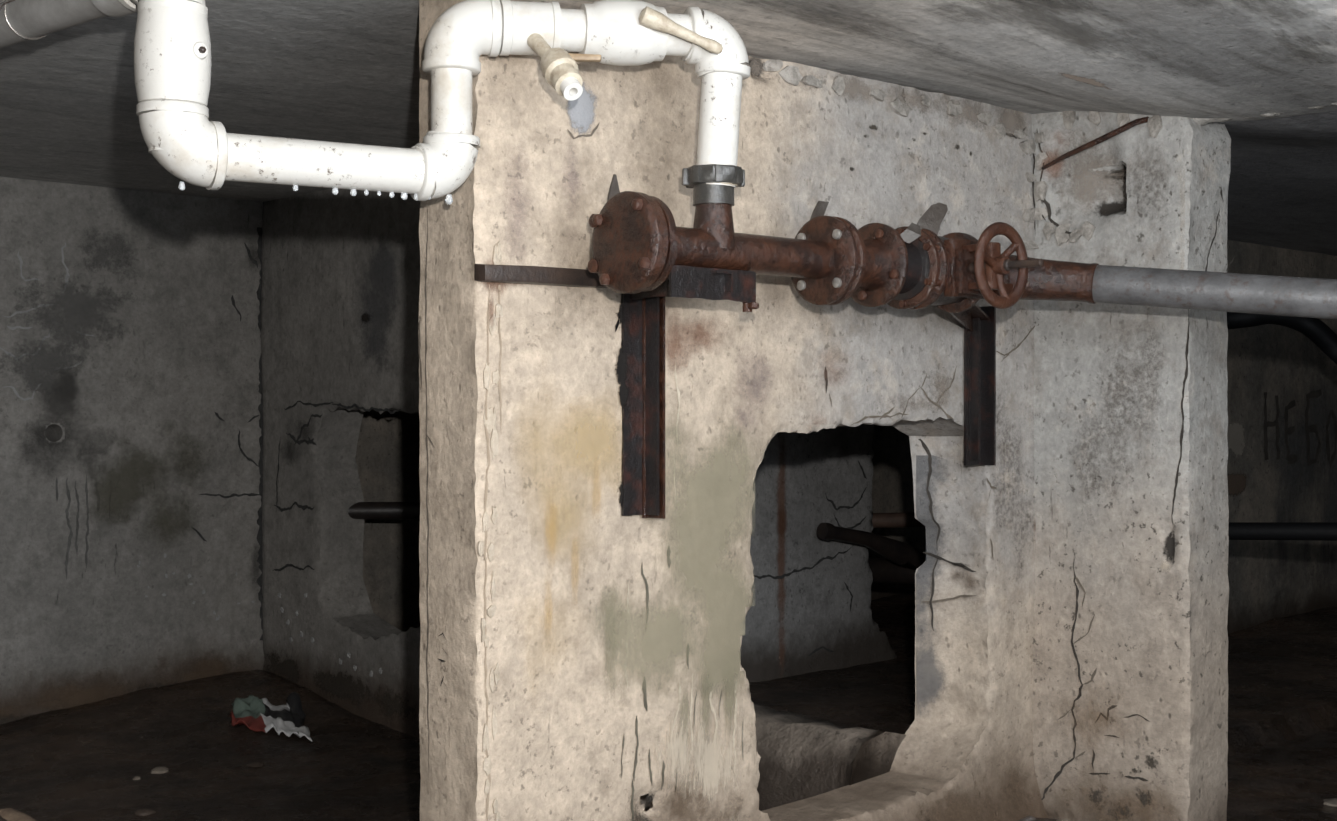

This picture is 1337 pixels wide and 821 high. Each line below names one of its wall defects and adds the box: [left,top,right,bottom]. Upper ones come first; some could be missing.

leakage [946,0,1114,50]
leakage [5,282,123,418]
leakage [56,454,189,580]
crack [199,213,435,766]
leakage [606,352,751,821]
crack [825,366,993,631]
crack [996,326,1035,362]
crack [1041,559,1150,800]
crack [1162,309,1190,569]